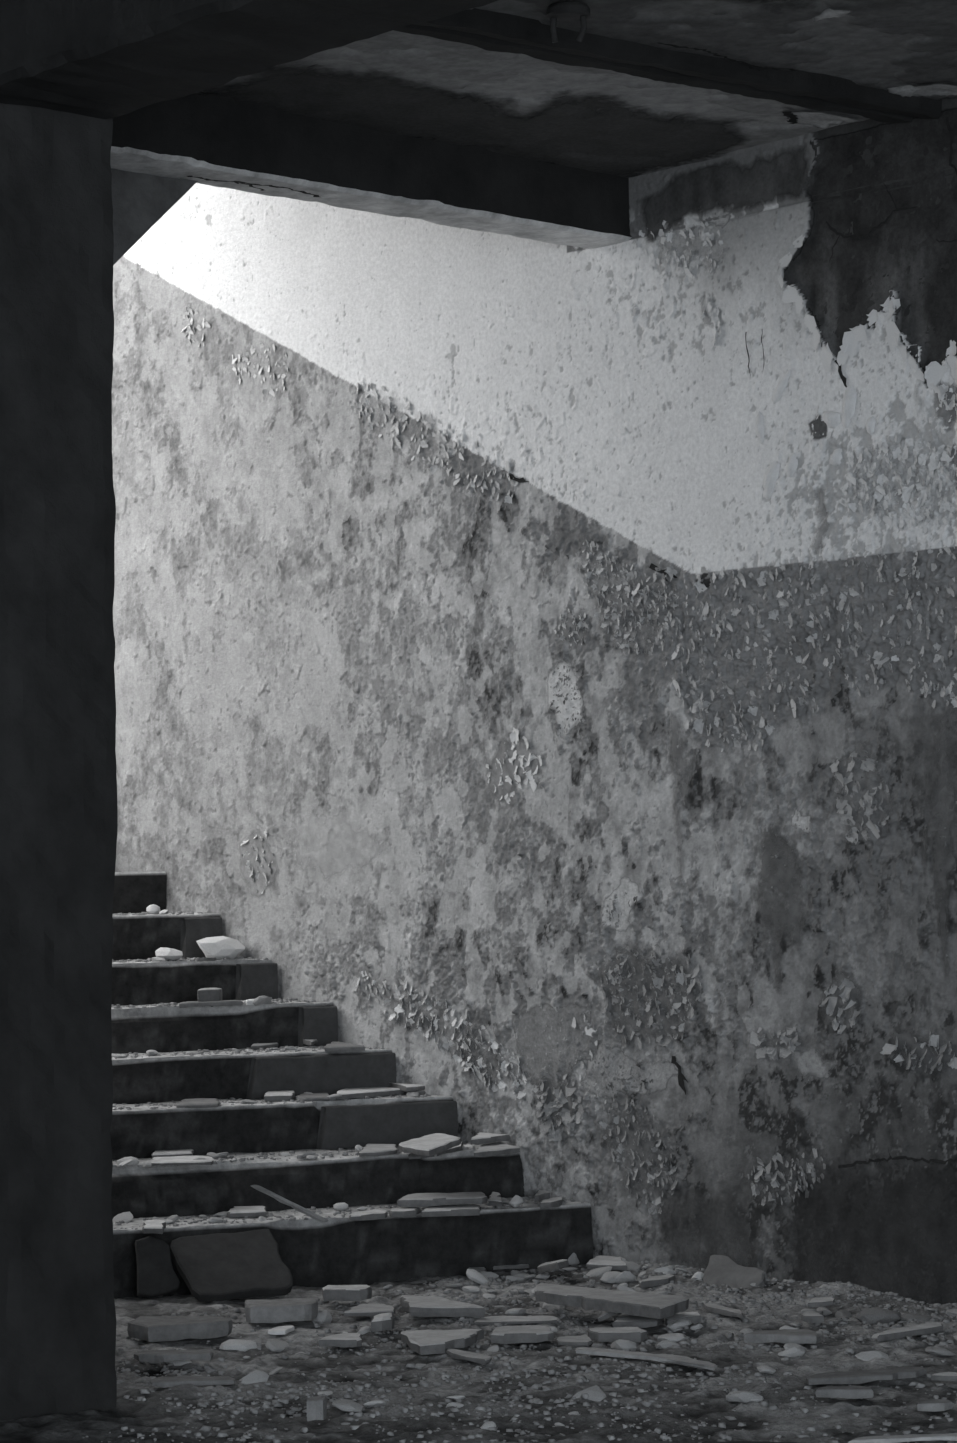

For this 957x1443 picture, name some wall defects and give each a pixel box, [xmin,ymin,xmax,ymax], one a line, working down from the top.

peeling [634,207,730,279]
spalling [777,84,957,425]
spalling [804,410,831,450]
peeling [547,435,957,752]
peeling [486,727,542,804]
peeling [819,972,861,1034]
flaking render [355,877,705,1215]
peeling [880,1032,957,1074]
peeling [747,1148,826,1206]